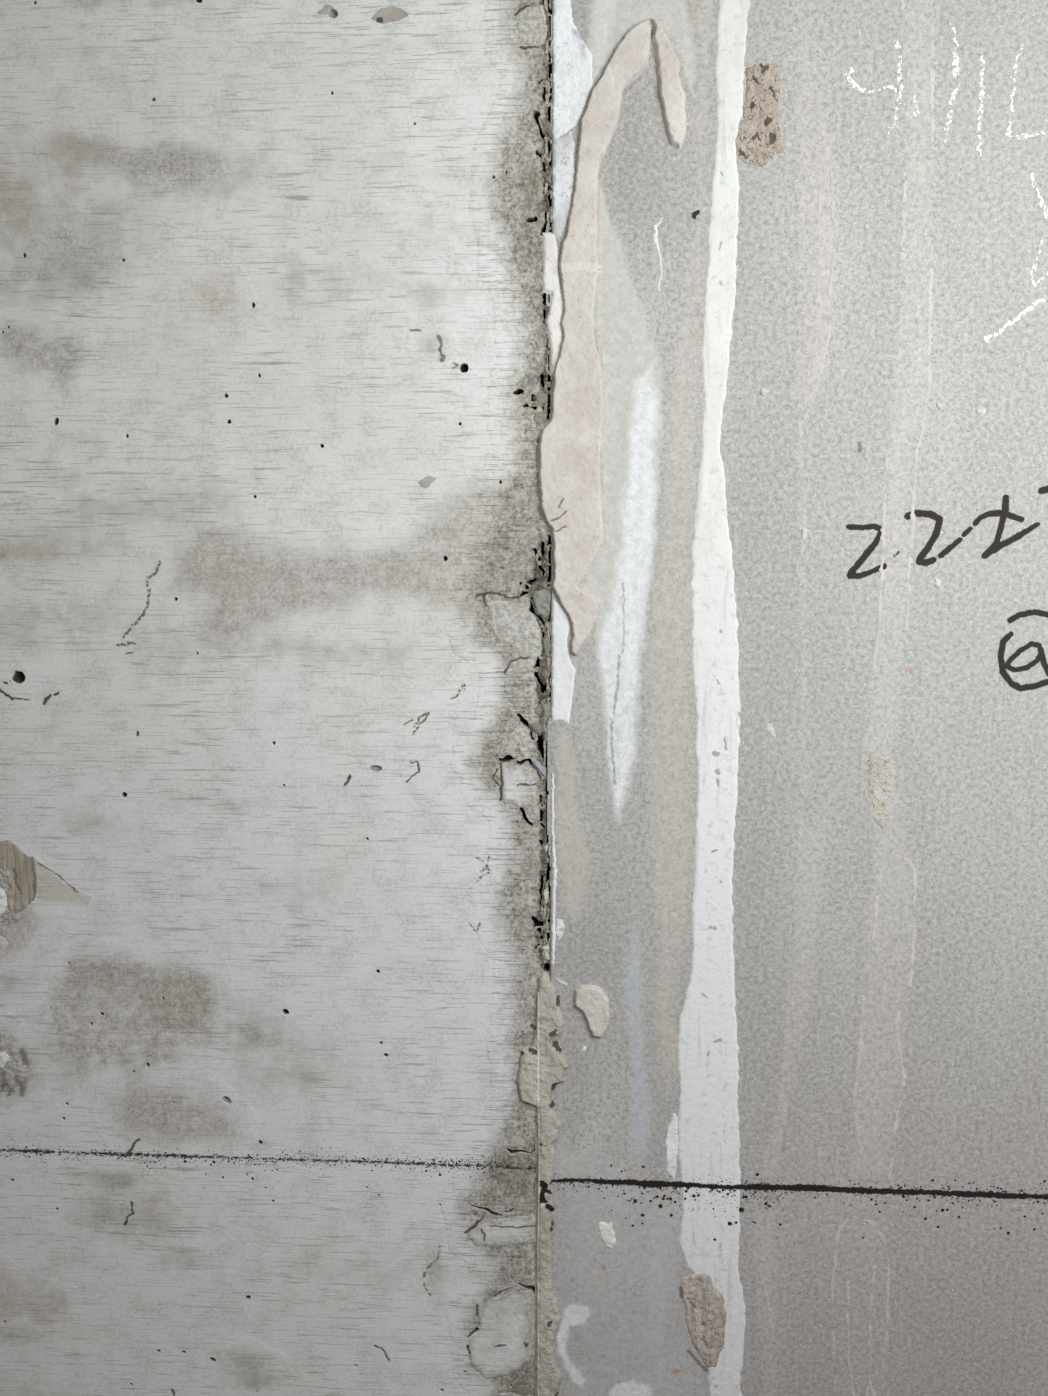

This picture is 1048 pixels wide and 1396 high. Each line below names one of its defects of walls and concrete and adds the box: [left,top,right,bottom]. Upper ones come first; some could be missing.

water stain [40,0,272,34]
water stain [149,0,663,1396]
spalling [0,840,95,950]
spalling [0,1029,33,1096]
water stain [0,896,261,1251]
spalling [521,1024,562,1055]
crack [506,1147,535,1155]
peeling [466,1283,552,1396]